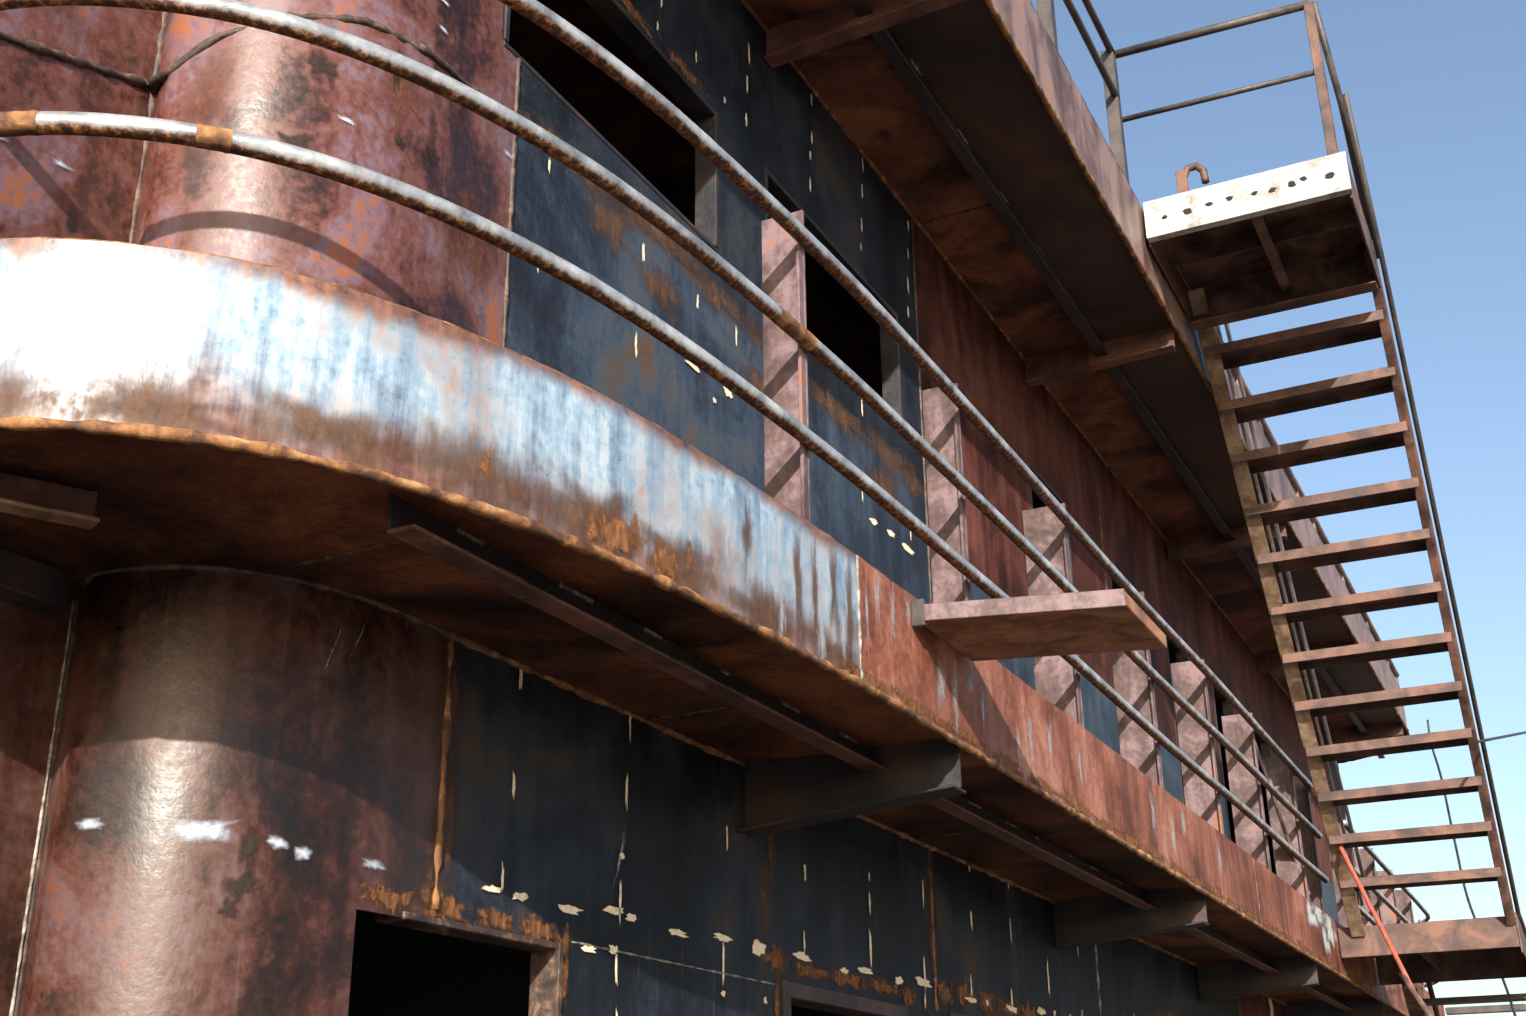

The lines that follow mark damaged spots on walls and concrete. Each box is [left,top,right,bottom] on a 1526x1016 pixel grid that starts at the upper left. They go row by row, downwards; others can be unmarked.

corrosion [308,52,337,76]
corrosion [0,110,42,137]
corrosion [278,131,309,148]
corrosion [771,306,818,351]
corrosion [0,378,32,413]
corrosion [70,383,208,429]
corrosion [746,368,764,394]
corrosion [258,397,386,462]
corrosion [417,431,1364,987]
corrosion [361,652,570,1016]
corrosion [743,824,919,1016]
corrosion [926,859,1036,1016]